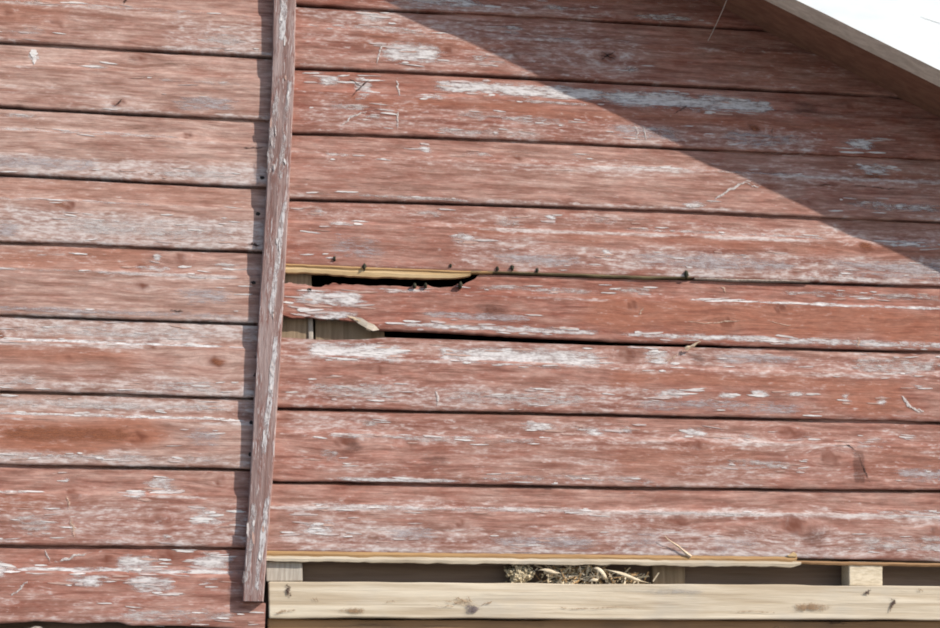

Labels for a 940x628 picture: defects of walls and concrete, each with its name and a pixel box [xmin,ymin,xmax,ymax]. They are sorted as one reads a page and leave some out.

peeling [279,0,287,46]
peeling [420,79,773,115]
peeling [267,75,291,178]
peeling [269,202,376,319]
peeling [310,342,410,360]
peeling [430,344,614,368]
peeling [629,331,940,389]
peeling [262,337,278,452]
peeling [642,388,823,416]
peeling [280,503,454,542]
peeling [0,498,269,596]
peeling [125,606,264,627]